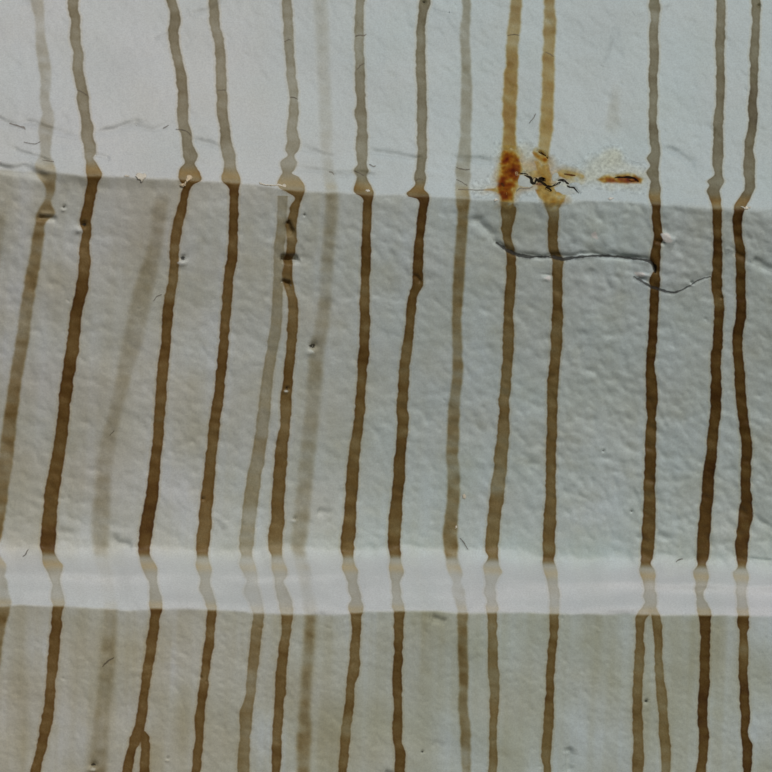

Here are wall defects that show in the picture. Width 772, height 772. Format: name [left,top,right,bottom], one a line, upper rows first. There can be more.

damp [0,0,59,543]
damp [27,0,105,772]
damp [85,0,205,772]
damp [189,0,243,772]
damp [234,0,342,772]
damp [335,0,377,772]
damp [385,0,433,772]
damp [440,0,475,772]
rust [470,0,649,772]
crack [495,241,711,294]
damp [629,0,674,772]
damp [690,0,764,772]